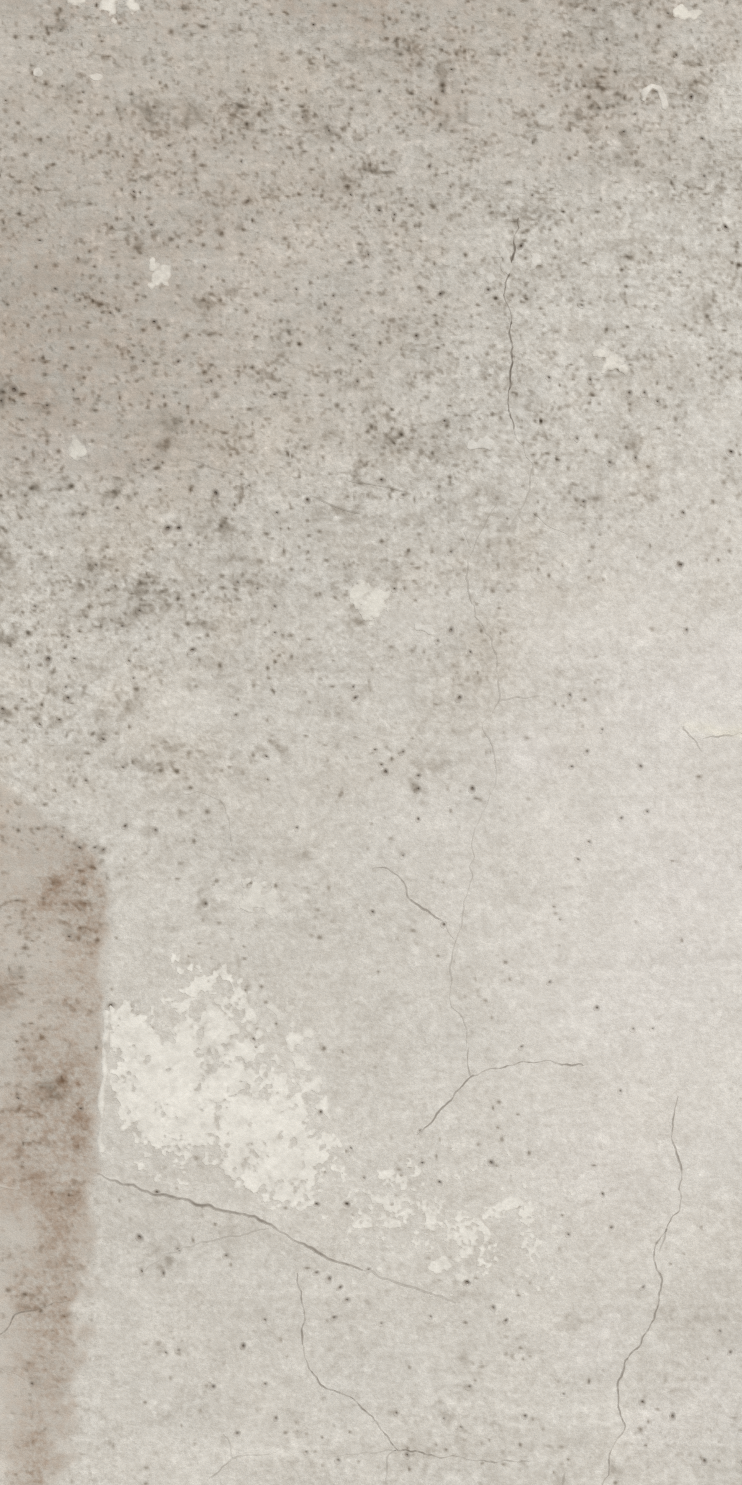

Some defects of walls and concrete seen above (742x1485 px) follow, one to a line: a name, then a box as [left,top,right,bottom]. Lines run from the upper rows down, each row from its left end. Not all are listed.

crack [372,218,584,1135]
leakage [0,778,116,1485]
crack [97,1173,566,1485]
peeling [97,953,572,1296]
crack [602,1096,683,1485]